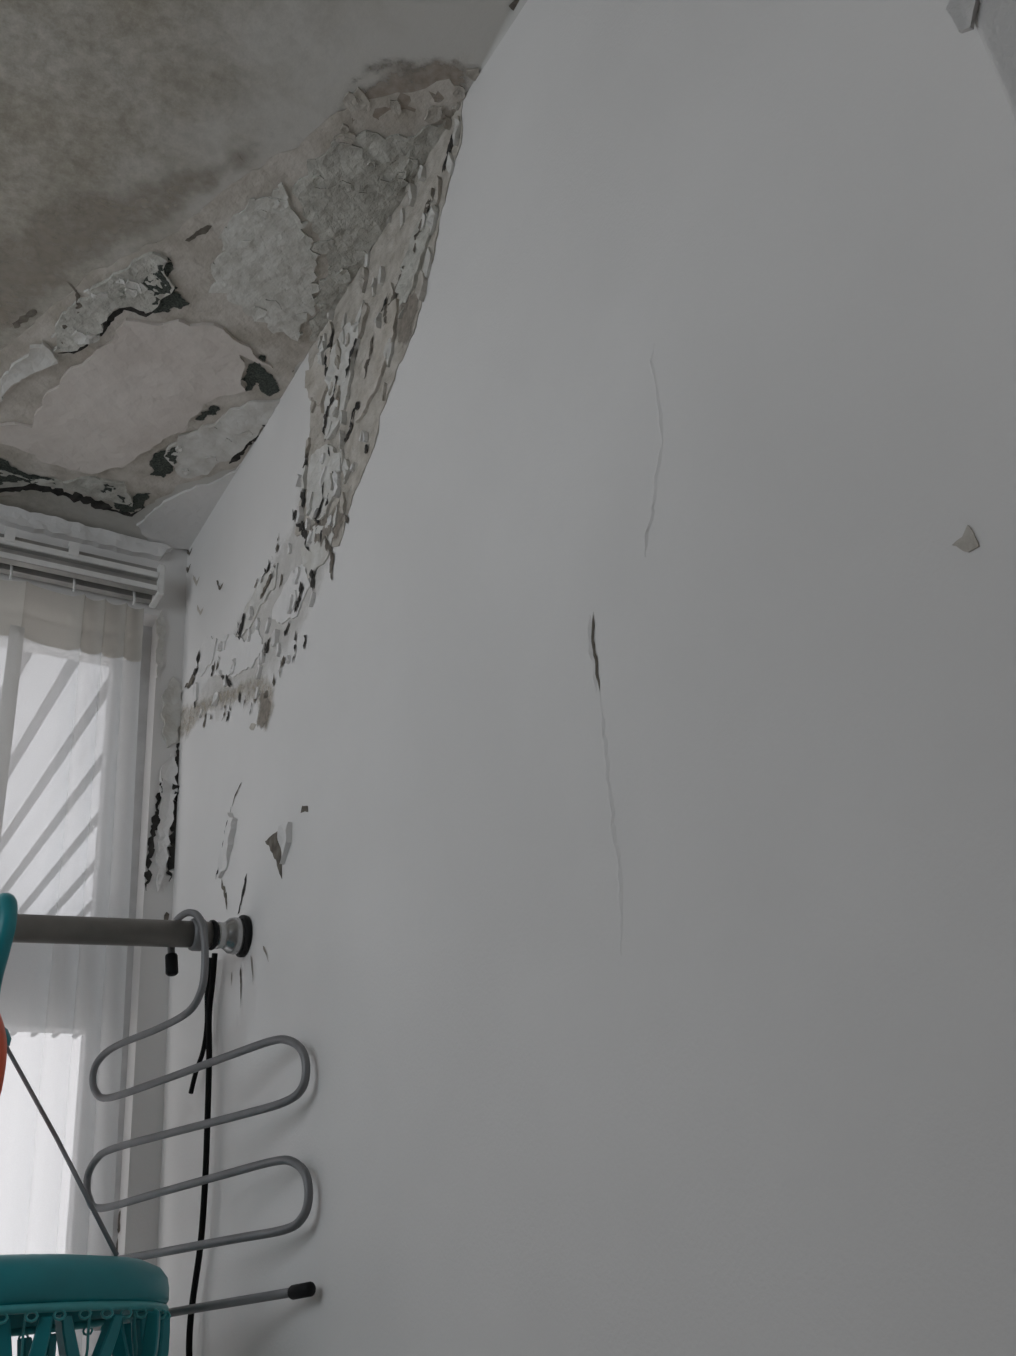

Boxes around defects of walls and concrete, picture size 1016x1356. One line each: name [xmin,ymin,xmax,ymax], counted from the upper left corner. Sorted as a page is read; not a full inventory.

crack [946,0,979,33]
peeling [0,67,479,892]